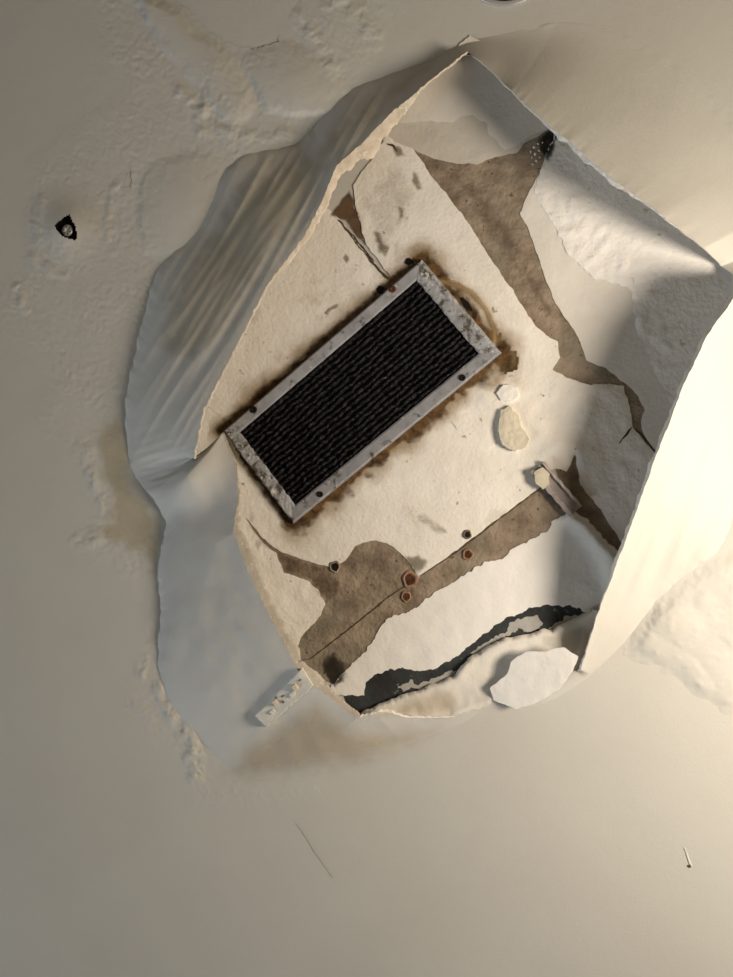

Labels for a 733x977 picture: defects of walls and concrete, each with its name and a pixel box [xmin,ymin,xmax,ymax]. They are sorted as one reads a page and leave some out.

damp [539,131,557,160]
damp [214,295,374,437]
peeling [125,22,733,779]
damp [408,557,426,571]
damp [323,654,345,686]